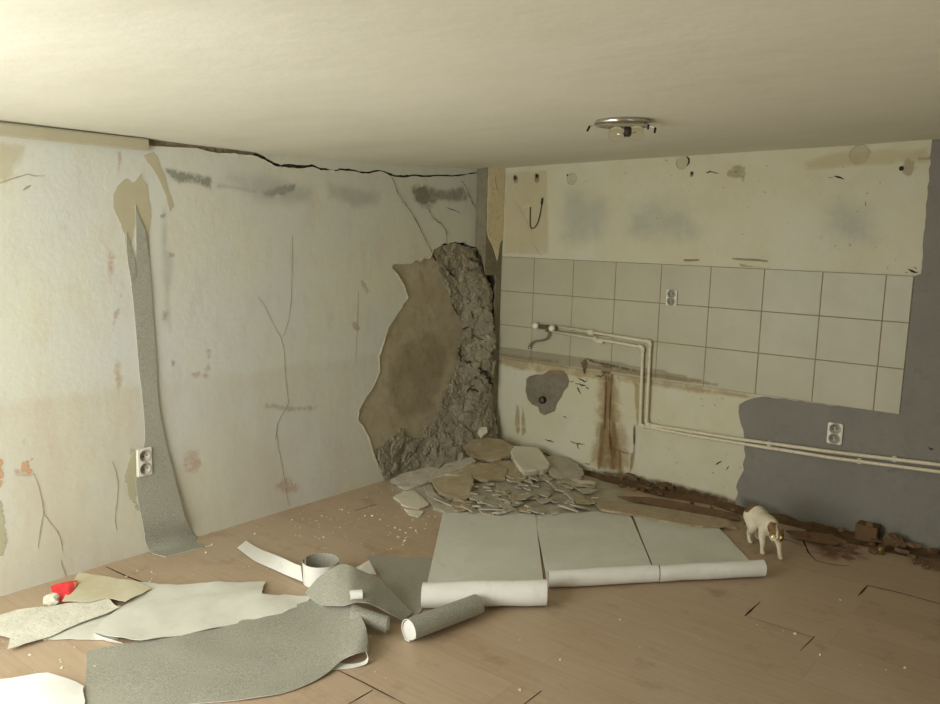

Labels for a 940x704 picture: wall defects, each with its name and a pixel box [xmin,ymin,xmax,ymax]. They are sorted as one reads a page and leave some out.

peeling [113,174,151,257]
peeling [143,152,174,211]
crack [149,140,498,261]
crack [258,279,292,503]
flaking render [357,246,463,470]
flaking render [526,370,605,418]
water stain [587,358,636,374]
peeling [125,450,138,510]
crack [33,473,66,577]